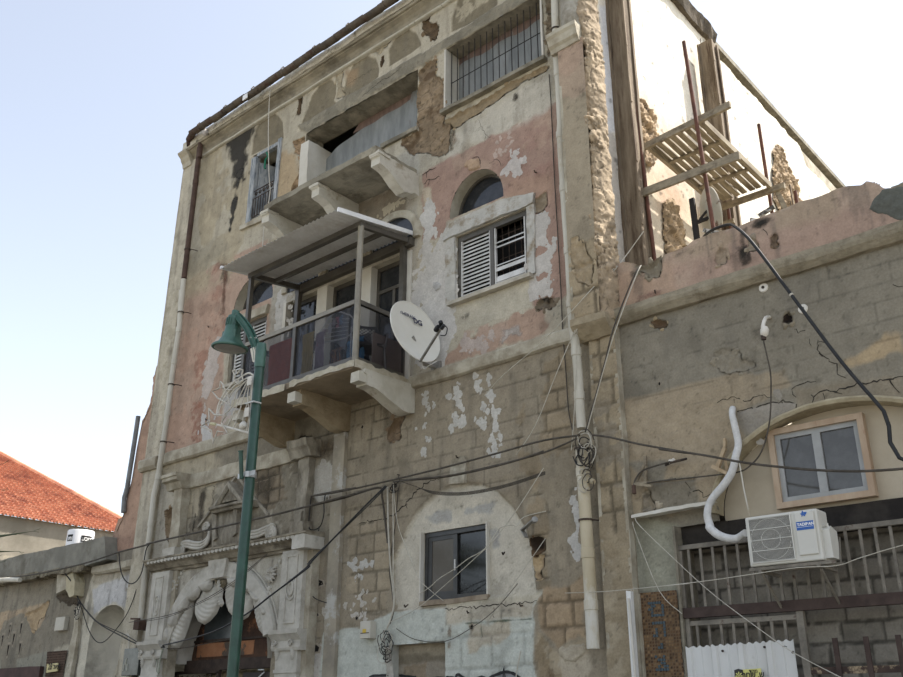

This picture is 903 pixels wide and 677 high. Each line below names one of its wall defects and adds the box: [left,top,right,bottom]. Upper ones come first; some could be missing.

flaking render [401,0,552,157]
water stain [226,127,254,231]
peeling [493,129,527,178]
flaking render [569,0,620,318]
peeling [411,192,560,370]
peeling [197,336,250,441]
peeling [415,390,436,458]
peeling [445,372,503,458]
crack [717,329,903,412]
peeling [343,557,376,621]
flaking render [529,535,545,581]
peeling [567,487,581,562]